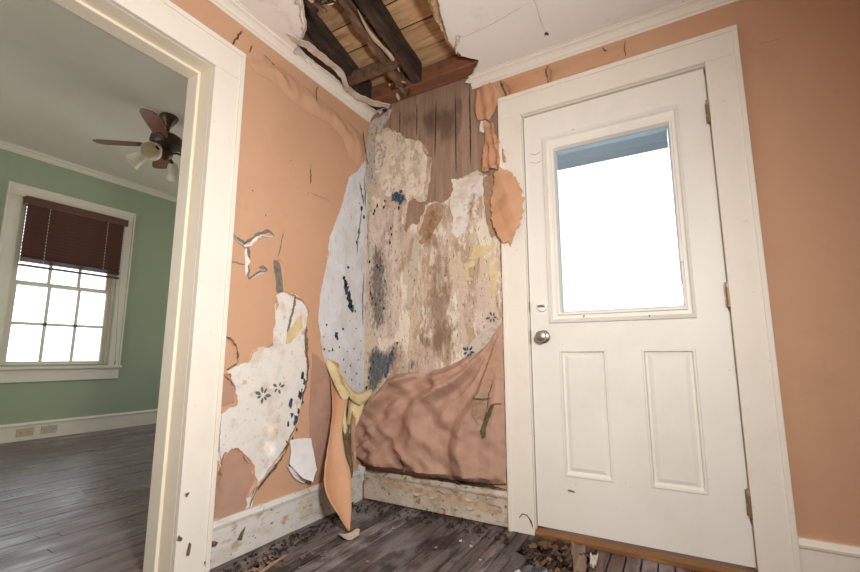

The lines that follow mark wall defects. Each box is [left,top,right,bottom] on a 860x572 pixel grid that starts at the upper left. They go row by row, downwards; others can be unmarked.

spalling [436,0,460,57]
water stain [373,190,406,215]
water stain [369,245,387,328]